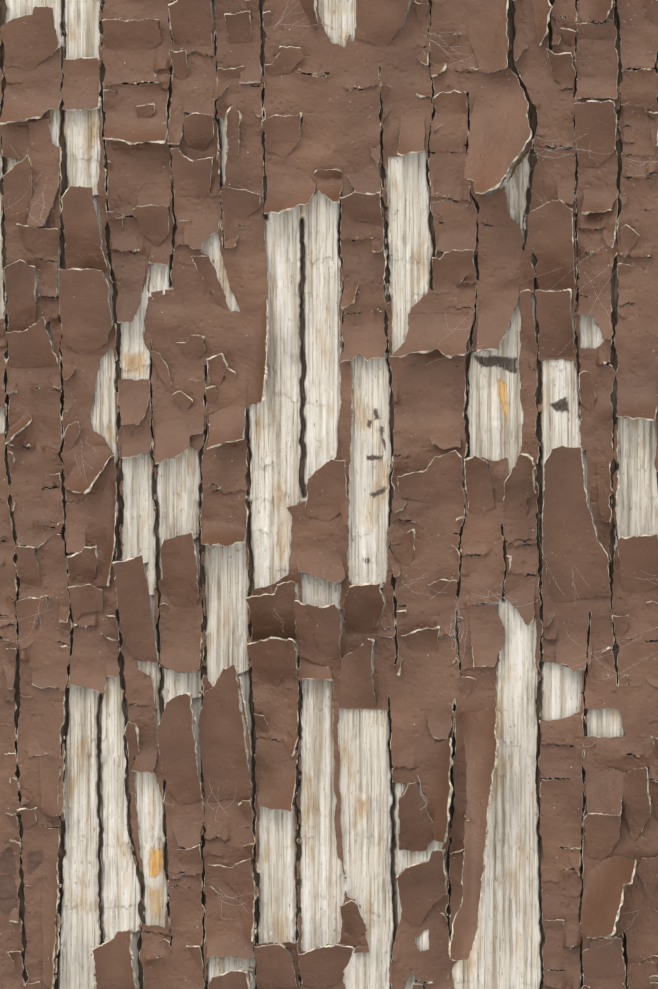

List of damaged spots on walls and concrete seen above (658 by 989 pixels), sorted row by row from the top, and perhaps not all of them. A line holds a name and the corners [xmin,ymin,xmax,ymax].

peeling [0,84,117,369]
peeling [0,0,161,78]
crack [99,0,177,561]
crack [426,0,458,289]
peeling [391,0,576,519]
crack [0,0,75,989]
crack [149,341,164,717]
peeling [23,107,477,989]
crack [507,0,658,989]
peeling [594,375,658,612]
crack [97,609,173,989]
peeling [440,575,592,989]